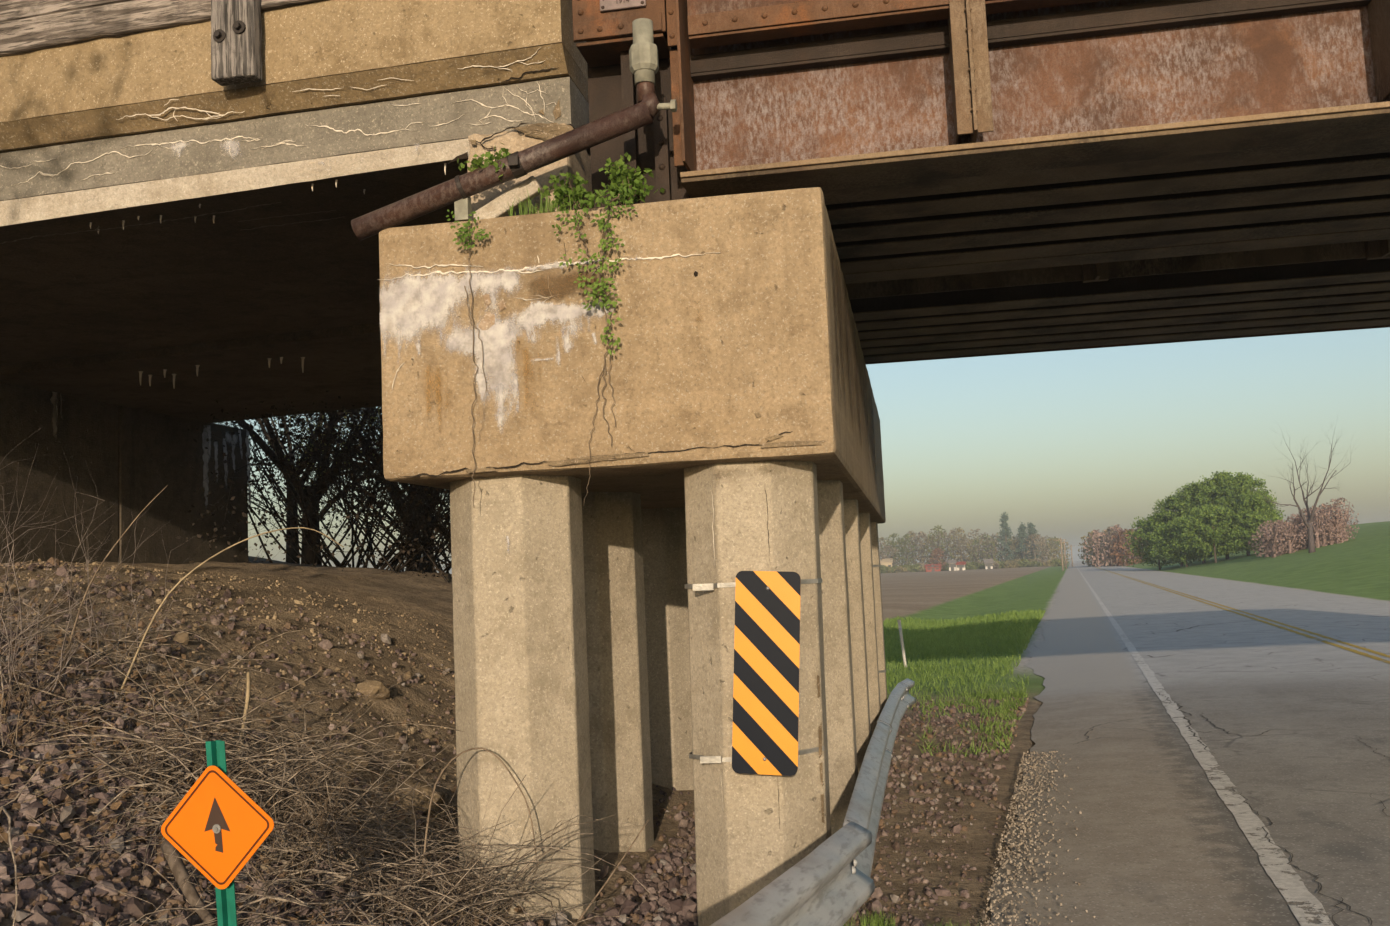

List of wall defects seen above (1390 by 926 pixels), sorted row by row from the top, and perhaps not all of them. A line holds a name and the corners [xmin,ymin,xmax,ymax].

crack [0,47,559,186]
crack [377,245,720,302]
water stain [379,260,612,429]